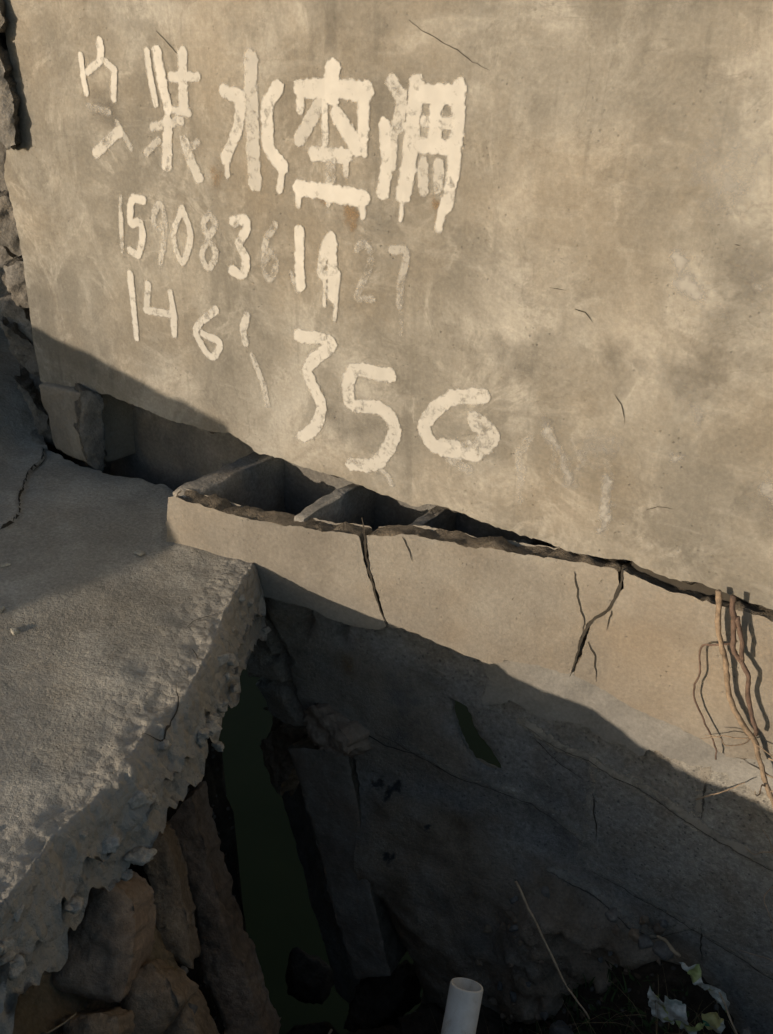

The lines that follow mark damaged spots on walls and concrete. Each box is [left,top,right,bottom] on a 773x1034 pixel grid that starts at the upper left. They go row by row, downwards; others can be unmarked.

crack [1,449,45,529]
crack [361,518,388,628]
crack [570,561,768,676]